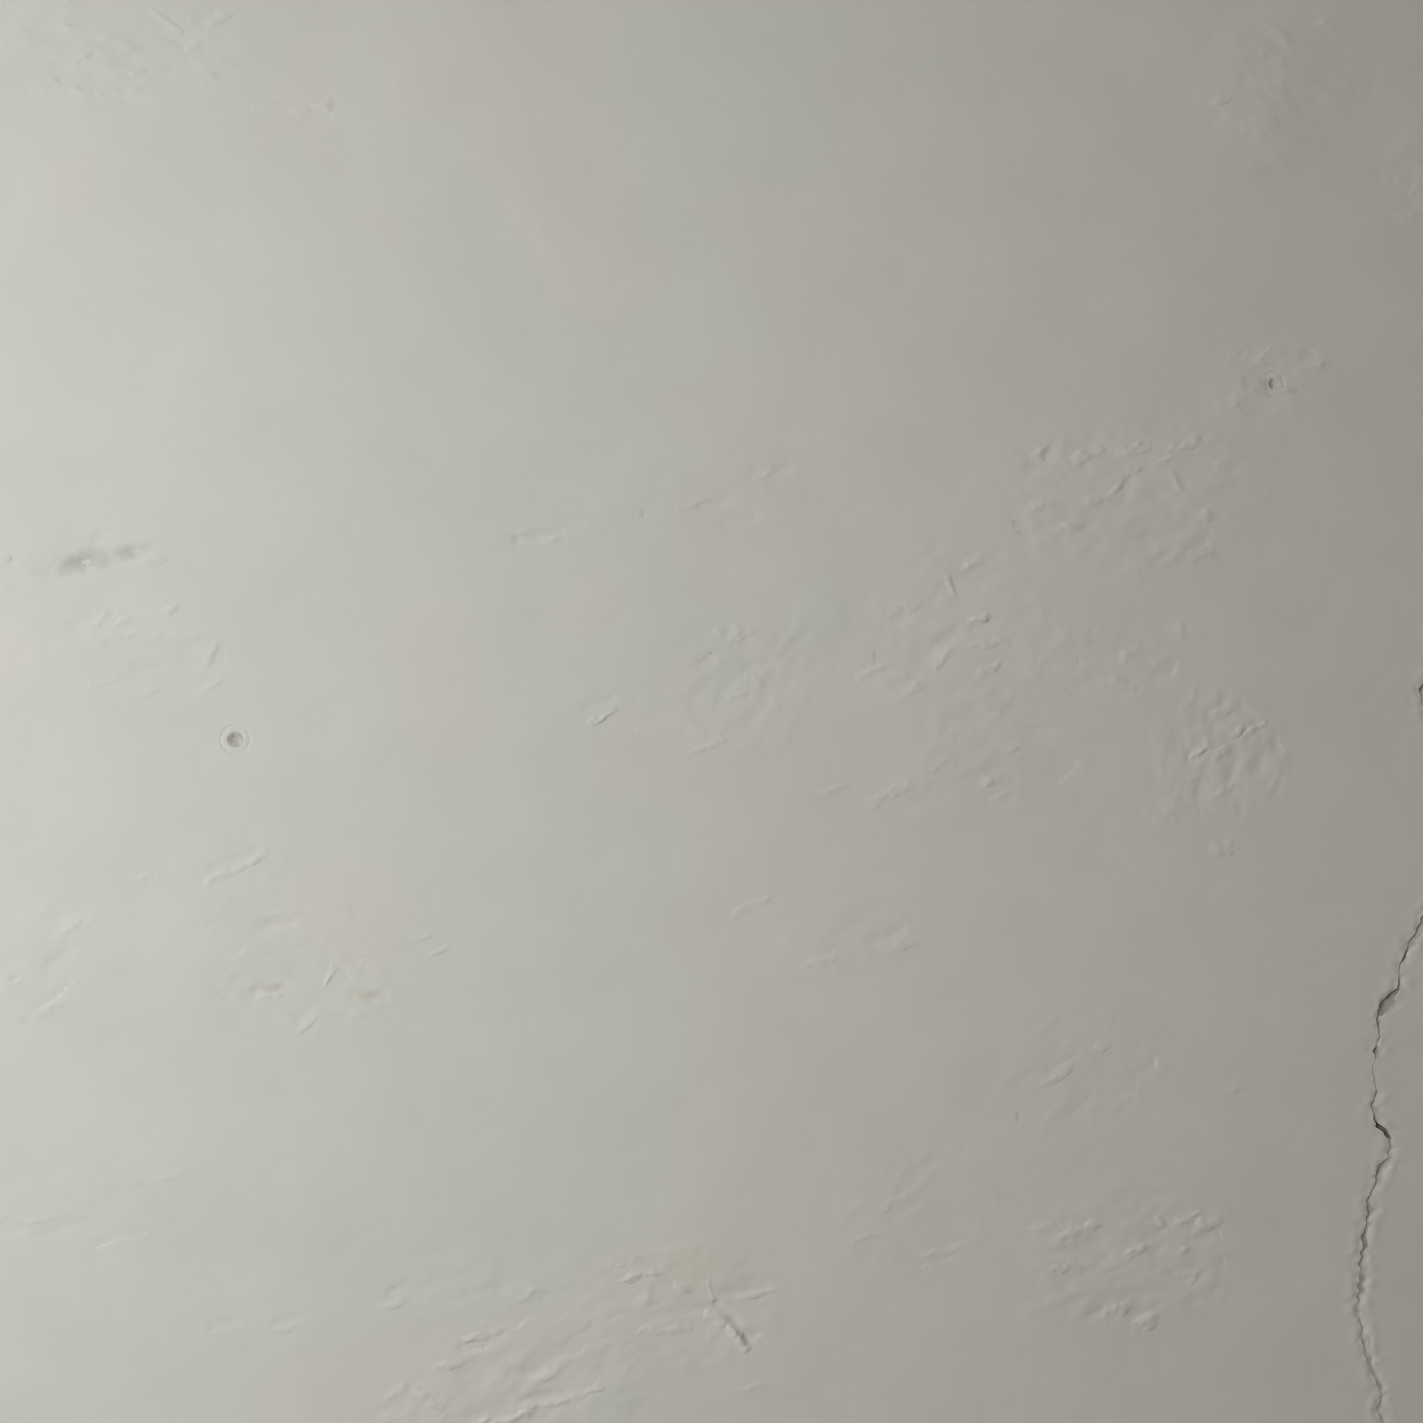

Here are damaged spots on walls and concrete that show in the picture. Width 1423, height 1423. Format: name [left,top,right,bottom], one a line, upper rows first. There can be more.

crack [1415,684,1423,705]
crack [1357,916,1423,1423]